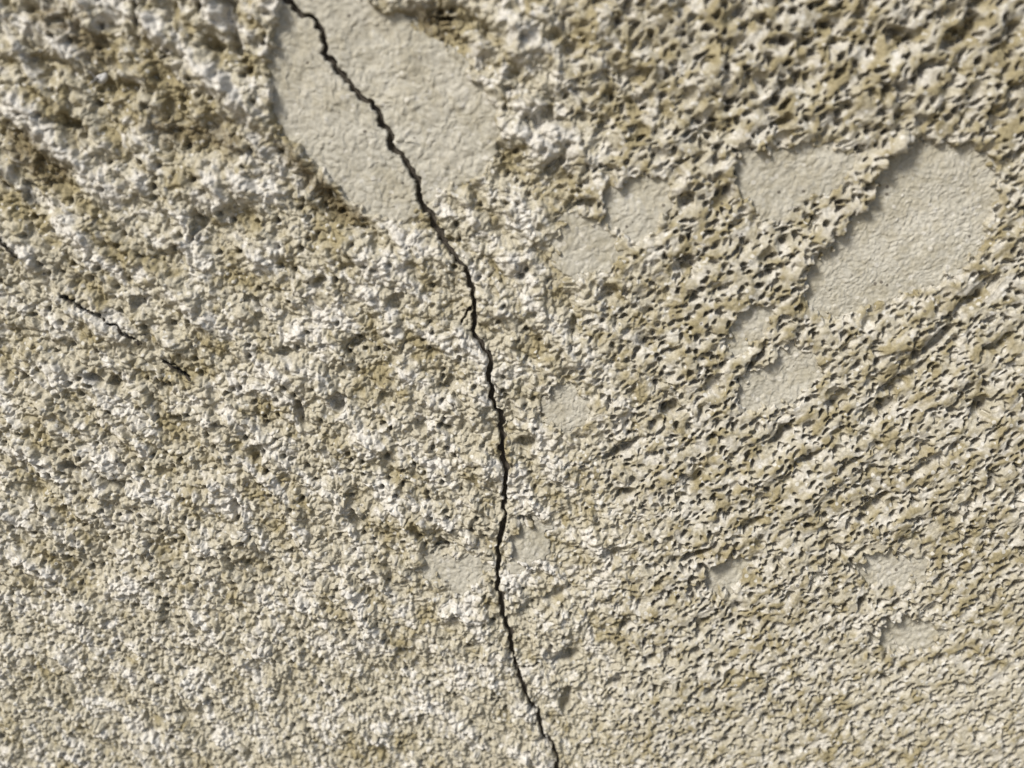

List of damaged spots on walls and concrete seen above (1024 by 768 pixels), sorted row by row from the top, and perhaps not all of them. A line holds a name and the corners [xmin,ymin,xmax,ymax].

spalling [267,0,501,224]
spalling [731,142,856,226]
crack [0,239,18,259]
spalling [550,208,624,281]
spalling [804,138,1001,319]
crack [59,296,140,346]
crack [162,360,190,381]
crack [283,0,559,768]